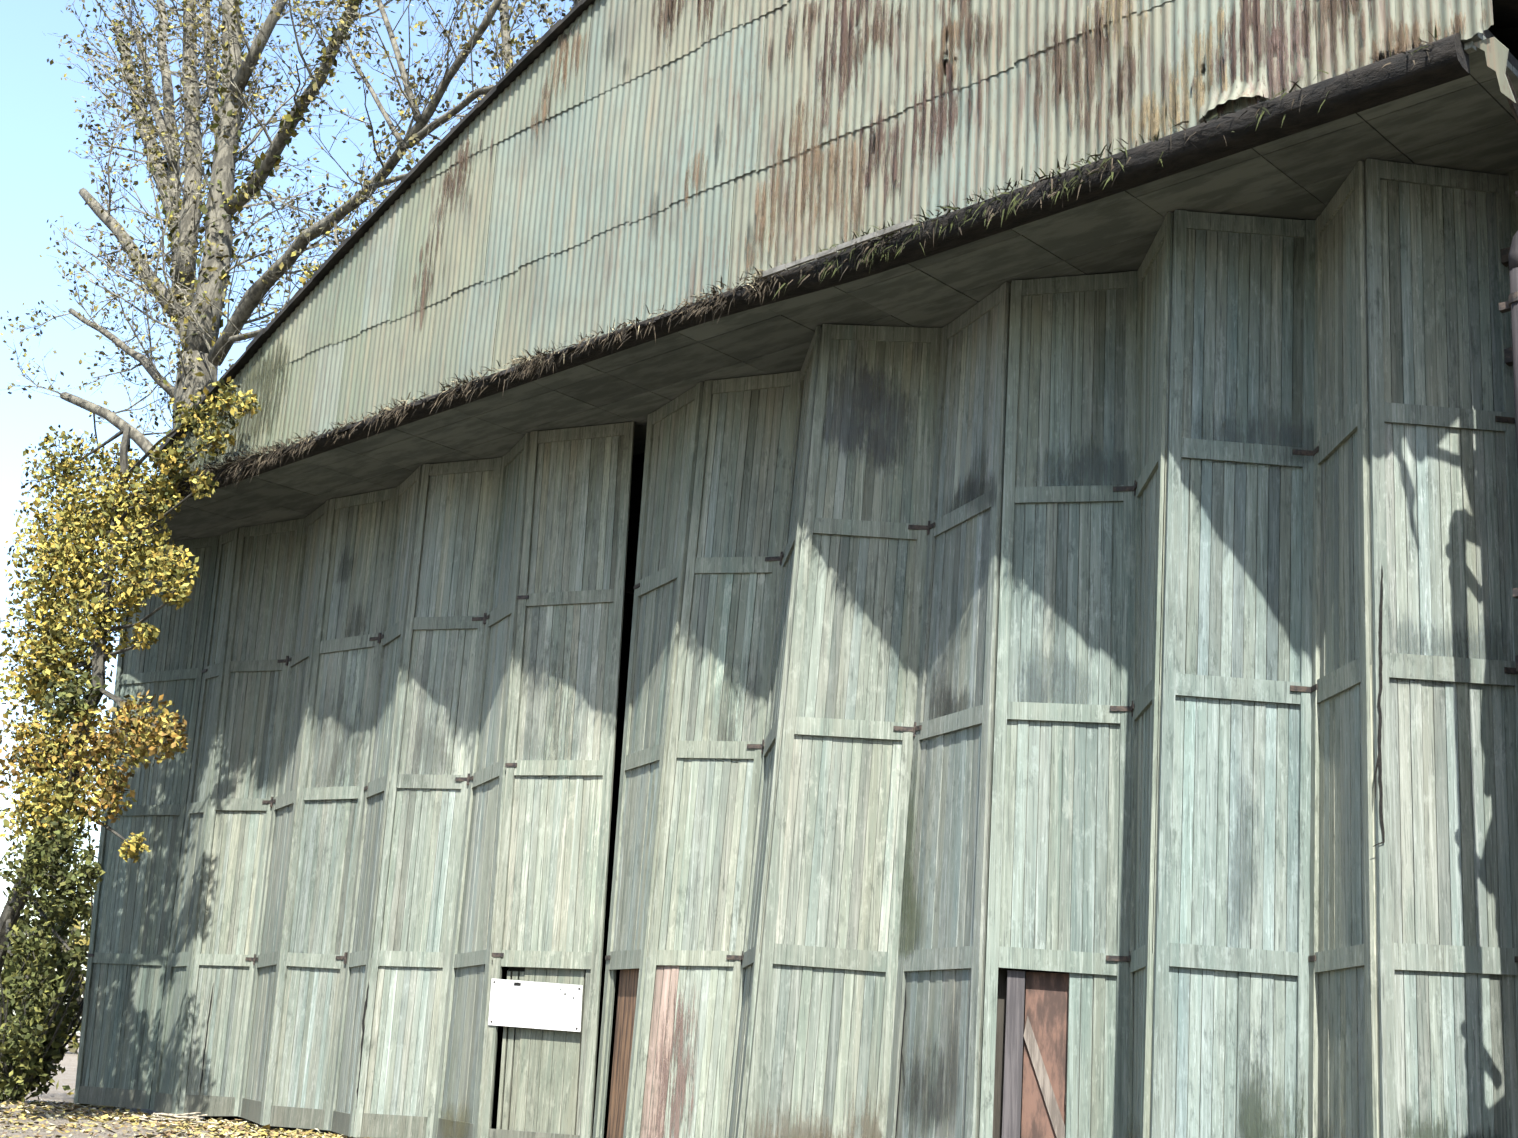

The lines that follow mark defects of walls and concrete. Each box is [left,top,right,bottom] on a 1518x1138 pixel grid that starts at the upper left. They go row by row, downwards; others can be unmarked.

corrosion [530,26,587,135]
corrosion [652,0,726,56]
corrosion [1027,0,1487,148]
corrosion [744,0,1003,271]
corrosion [412,136,493,331]
leakage [756,1105,882,1138]
leakage [1239,1080,1267,1138]